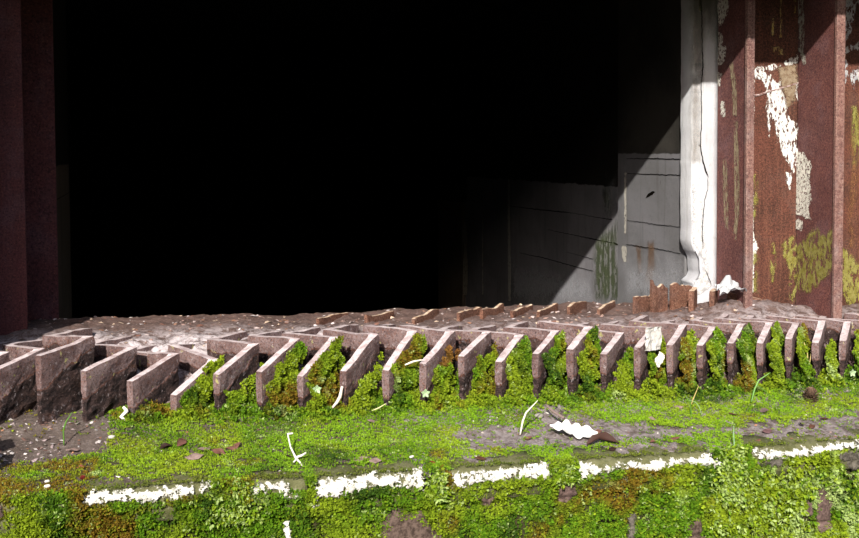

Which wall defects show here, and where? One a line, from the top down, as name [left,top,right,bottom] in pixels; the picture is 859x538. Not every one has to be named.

peeling [845,0,859,86]
crack [627,158,681,176]
crack [698,6,709,242]
corrosion [723,61,739,235]
peeling [755,0,812,231]
corrosion [778,65,799,108]
crack [511,206,681,271]
spalling [757,458,783,467]
spalling [839,449,859,471]
spalling [380,507,441,538]